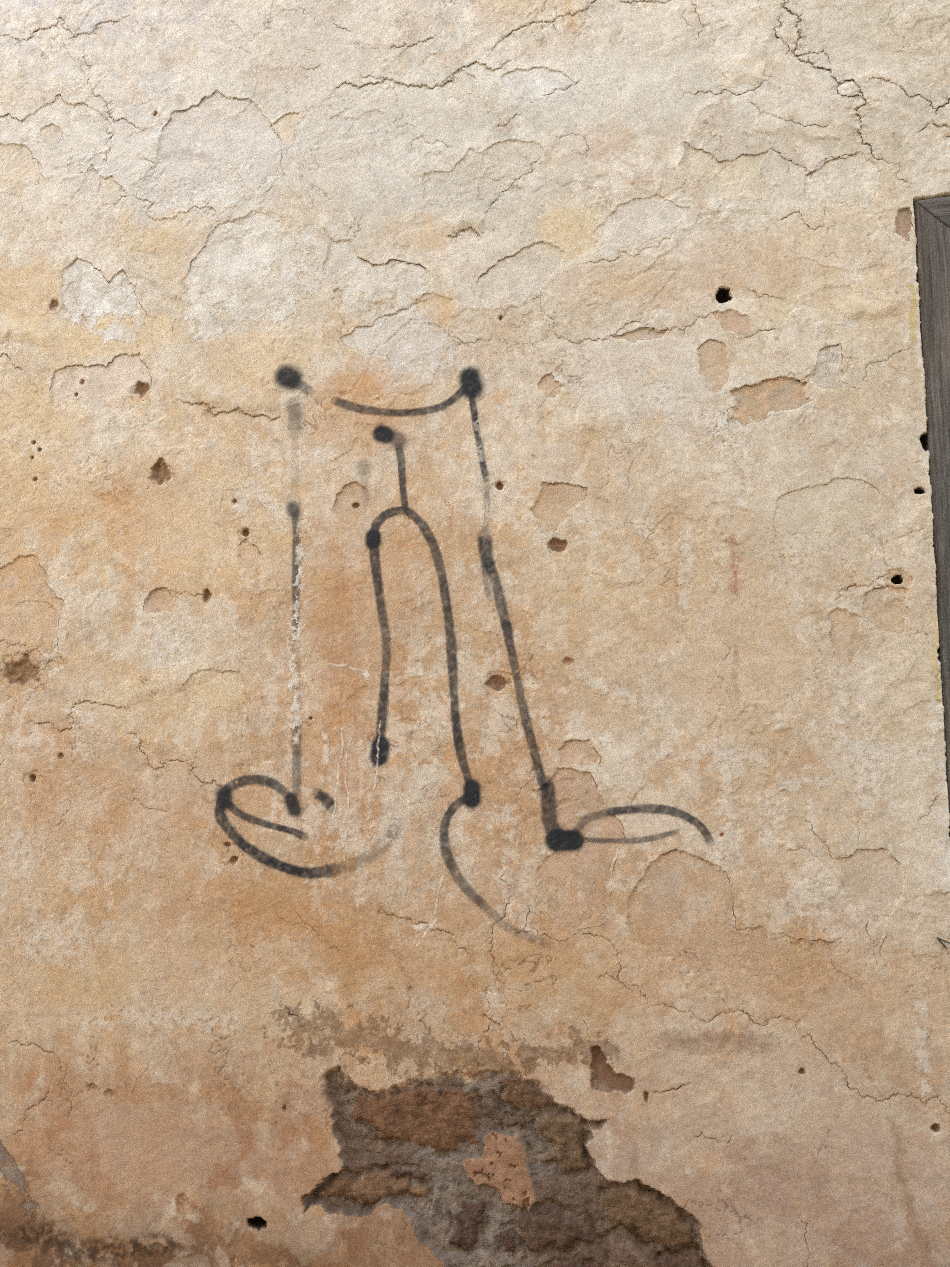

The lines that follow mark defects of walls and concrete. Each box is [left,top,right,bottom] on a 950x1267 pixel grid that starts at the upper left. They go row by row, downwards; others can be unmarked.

crack [81,65,216,220]
crack [683,80,828,127]
crack [770,0,950,182]
spalling [697,290,843,425]
peeling [0,562,64,702]
crack [377,874,551,1070]
spalling [268,994,712,1267]